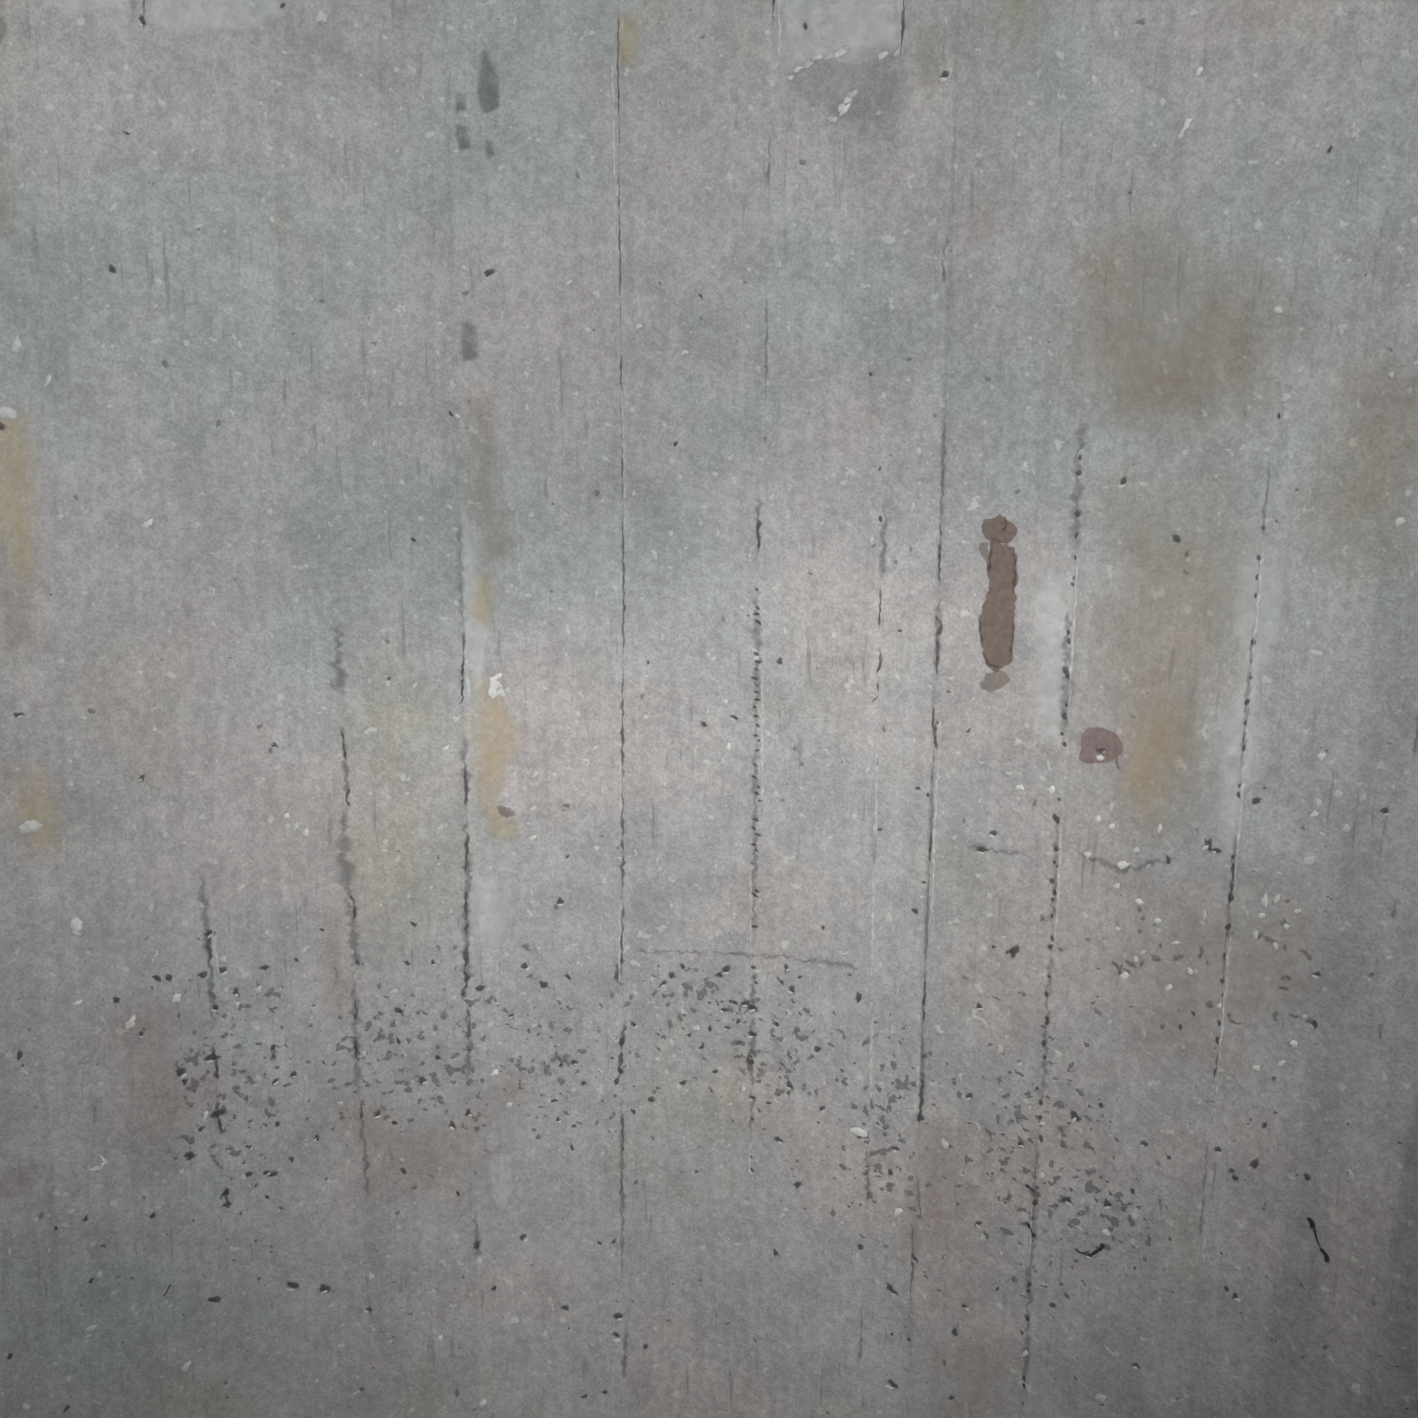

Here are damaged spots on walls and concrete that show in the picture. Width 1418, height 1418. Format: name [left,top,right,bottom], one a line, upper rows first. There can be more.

rust [1079,727,1122,769]